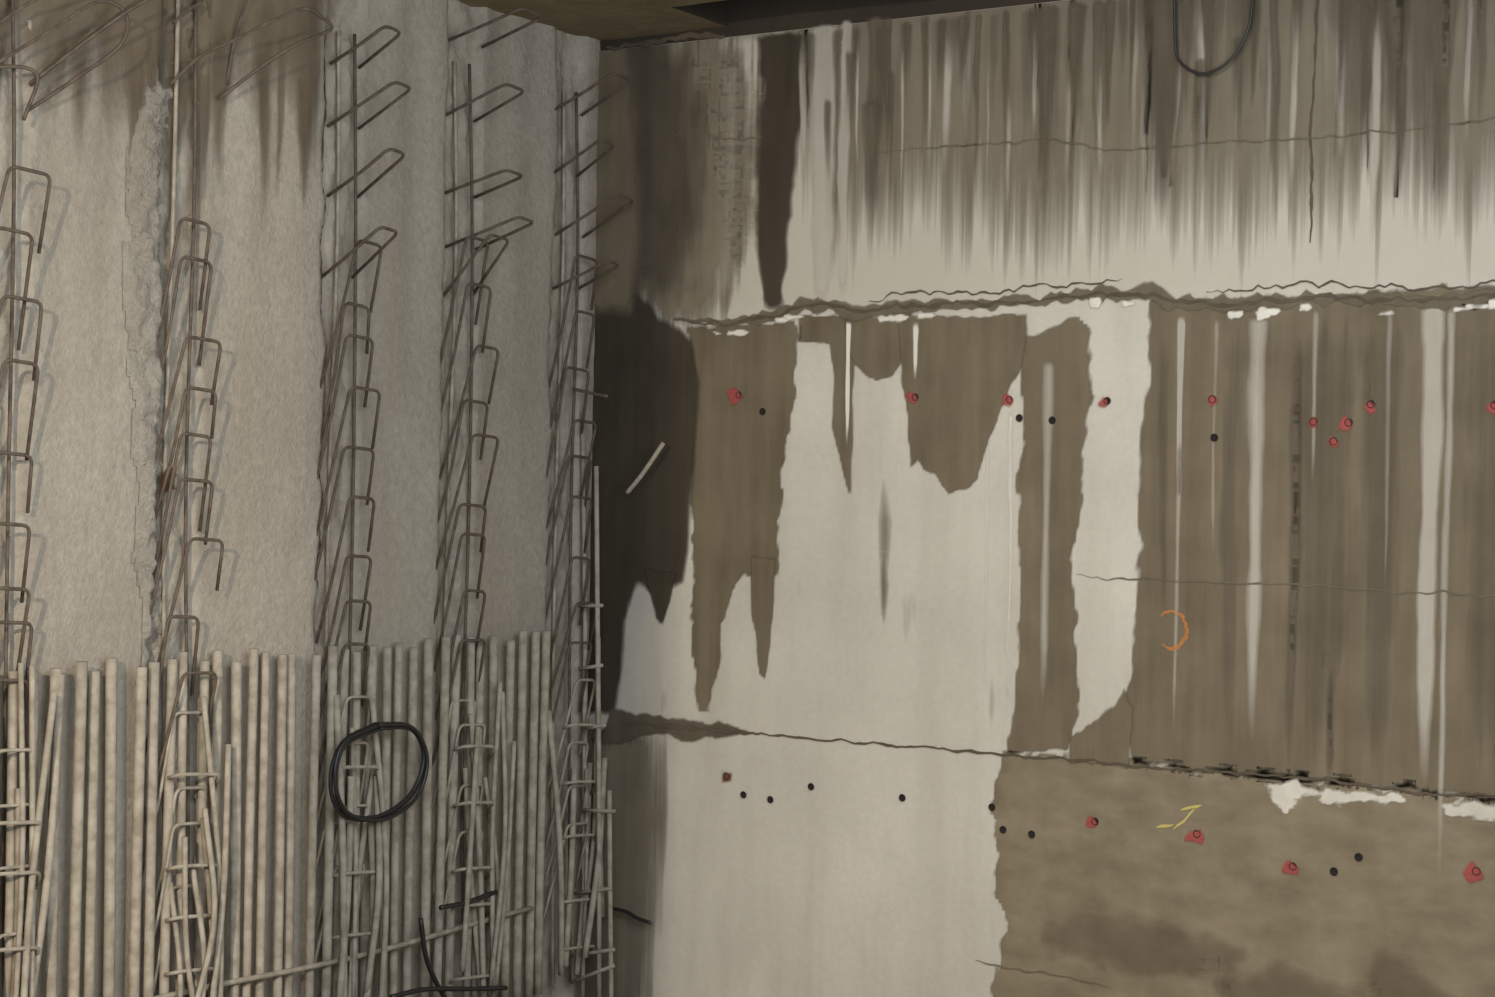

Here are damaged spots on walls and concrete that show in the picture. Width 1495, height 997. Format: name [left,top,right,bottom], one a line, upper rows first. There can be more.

spalling [3,81,551,997]
spalling [569,411,616,997]
leakage [585,0,1495,997]
crack [602,709,1495,798]
crack [674,279,1495,327]